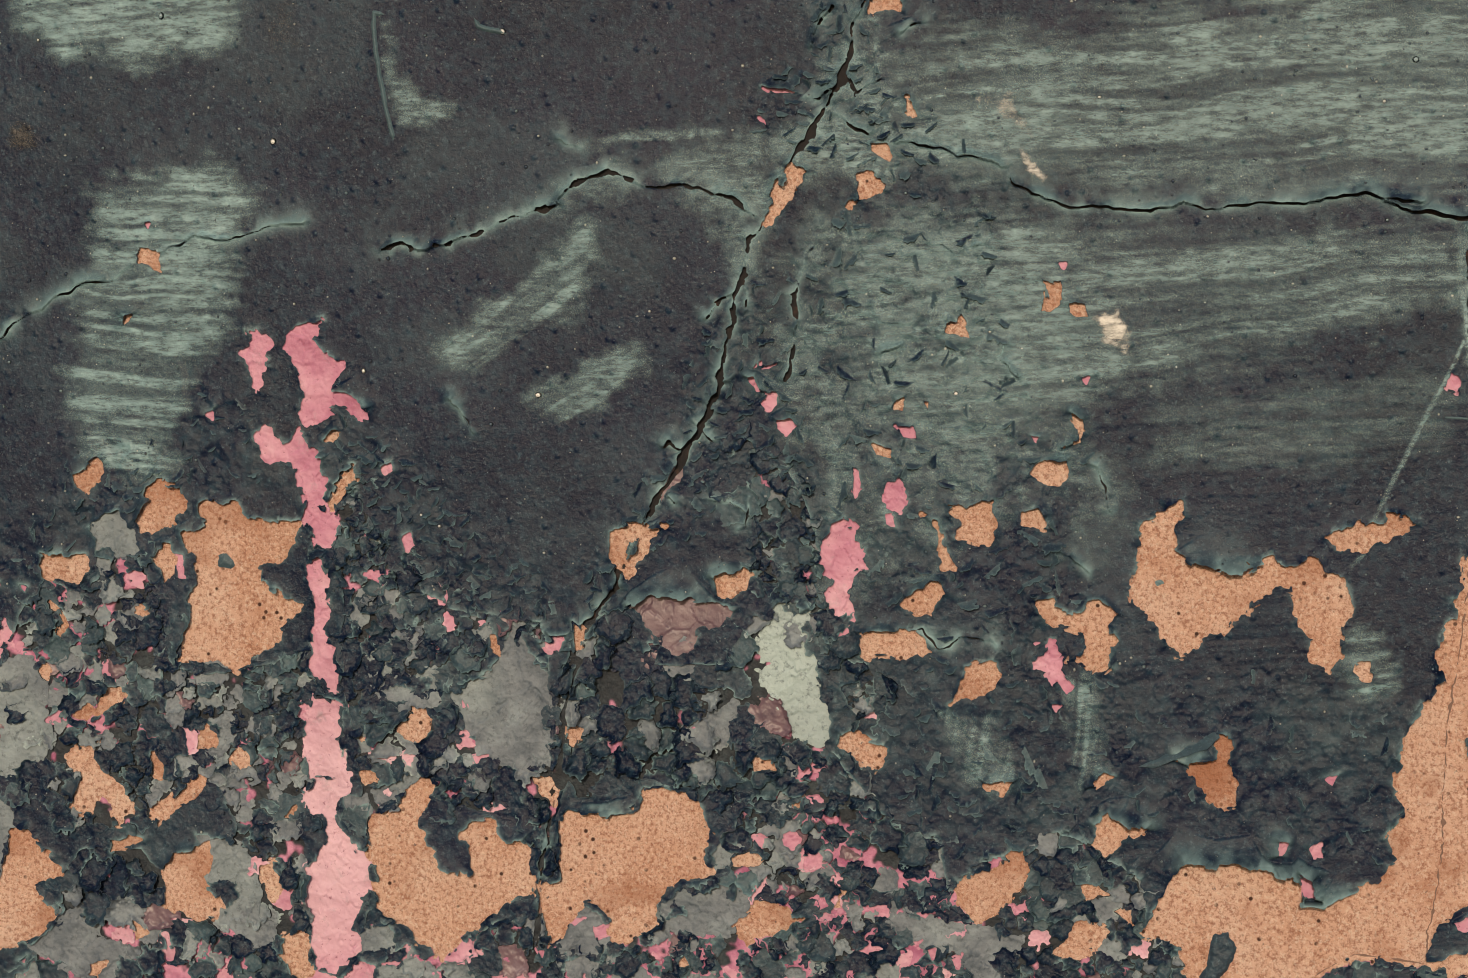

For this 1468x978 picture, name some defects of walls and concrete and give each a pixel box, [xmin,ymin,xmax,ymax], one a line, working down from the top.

crack [0,216,312,346]
peeling [749,0,940,271]
peeling [955,211,998,276]
crack [782,0,1468,362]
crack [371,132,824,625]
peeling [0,268,1468,978]
crack [907,621,1004,657]
crack [1056,547,1097,583]
crack [1088,460,1119,518]
crack [1315,572,1468,976]
crack [532,787,561,944]